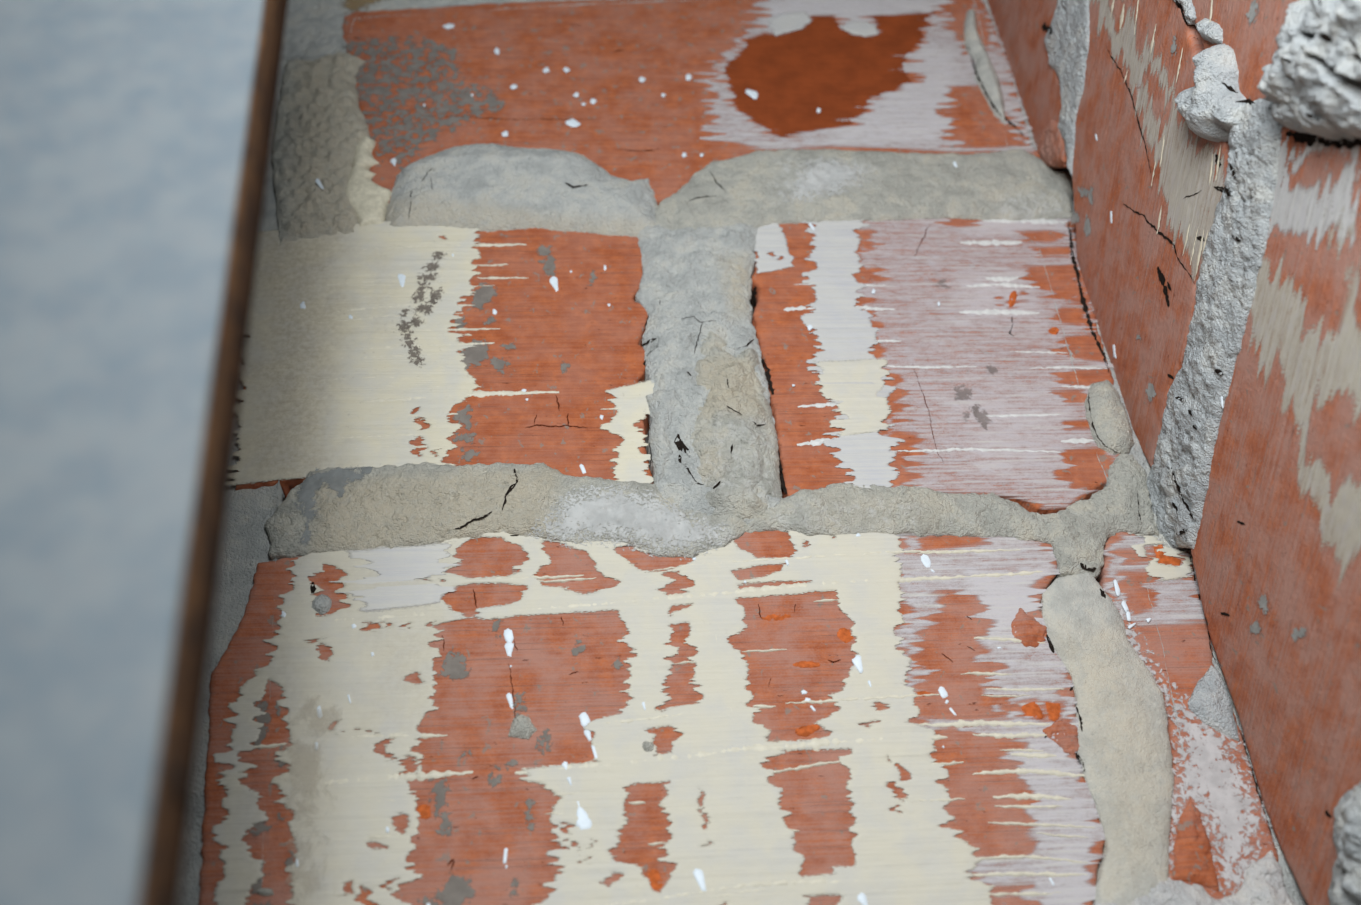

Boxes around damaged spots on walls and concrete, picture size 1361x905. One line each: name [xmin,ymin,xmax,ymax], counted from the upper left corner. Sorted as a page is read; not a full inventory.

peeling [722,11,935,138]
crack [1107,49,1151,172]
crack [455,469,518,536]
spalling [1153,544,1181,567]
spalling [837,628,854,643]
spalling [1011,608,1047,648]
spalling [795,724,820,737]
spalling [1021,701,1080,757]
spalling [416,804,431,820]
spalling [1172,798,1220,892]
spalling [648,869,664,892]